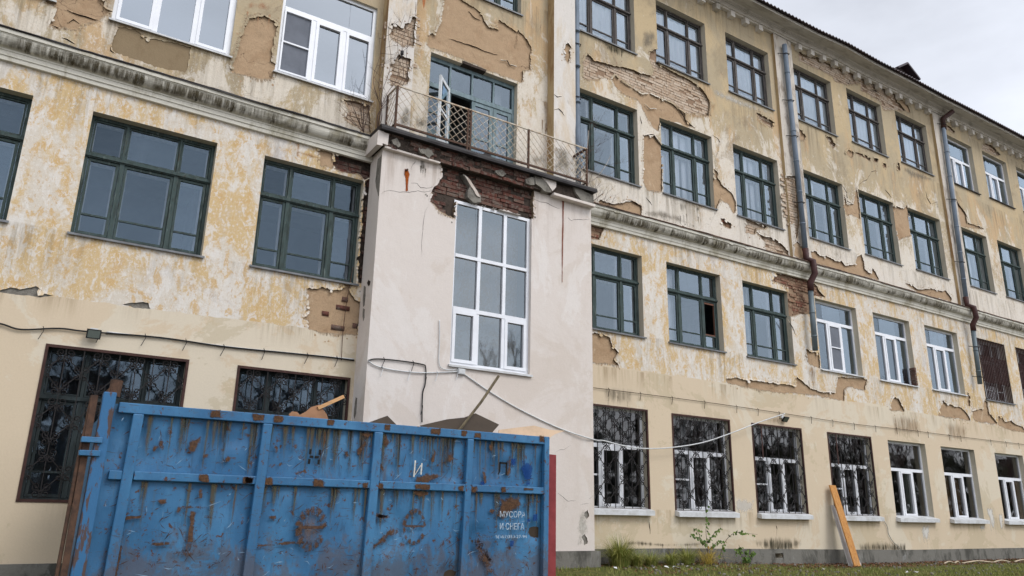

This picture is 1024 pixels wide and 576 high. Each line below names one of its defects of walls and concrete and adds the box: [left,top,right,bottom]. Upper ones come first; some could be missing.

damp [9,39,235,112]
peeling [229,13,280,86]
peeling [379,0,535,89]
flaking render [561,41,711,195]
spalling [300,132,536,342]
peeling [713,168,879,280]
peeling [0,284,53,297]
flaking render [769,272,825,321]
flaking render [592,331,620,370]
peeling [726,376,869,401]
peeling [887,395,905,416]
peeling [938,391,1024,433]